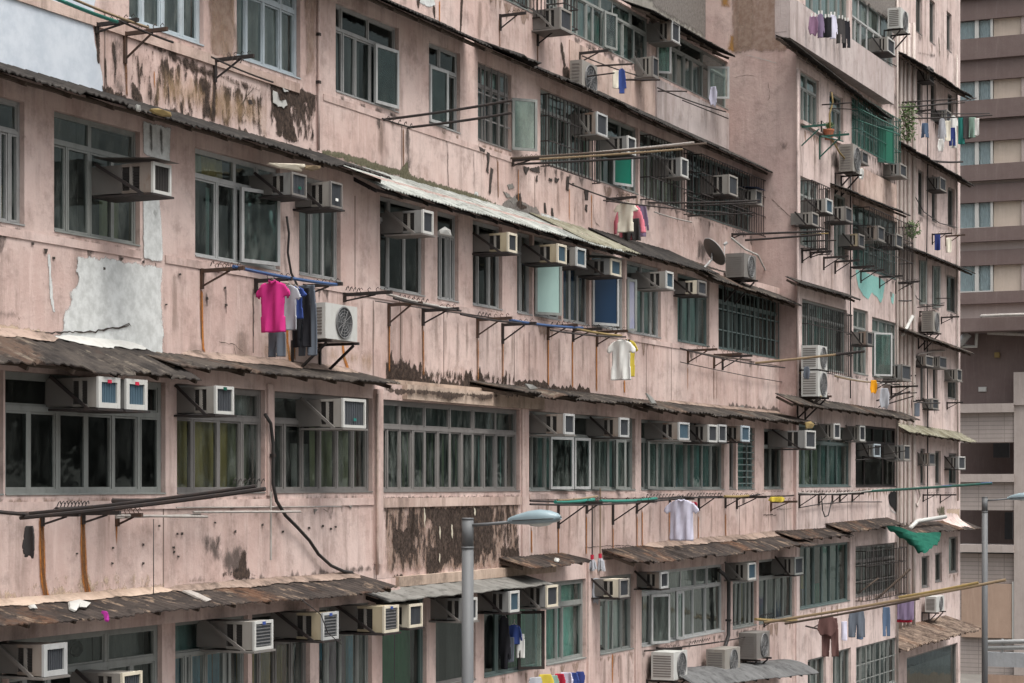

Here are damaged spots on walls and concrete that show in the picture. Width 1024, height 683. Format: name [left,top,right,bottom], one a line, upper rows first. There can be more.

leakage [94,28,317,150]
peeling [273,88,288,109]
peeling [0,200,168,353]
leakage [384,352,590,401]
rust [39,521,49,595]
rust [81,516,91,592]
leakage [206,537,250,580]
leakage [386,495,519,577]